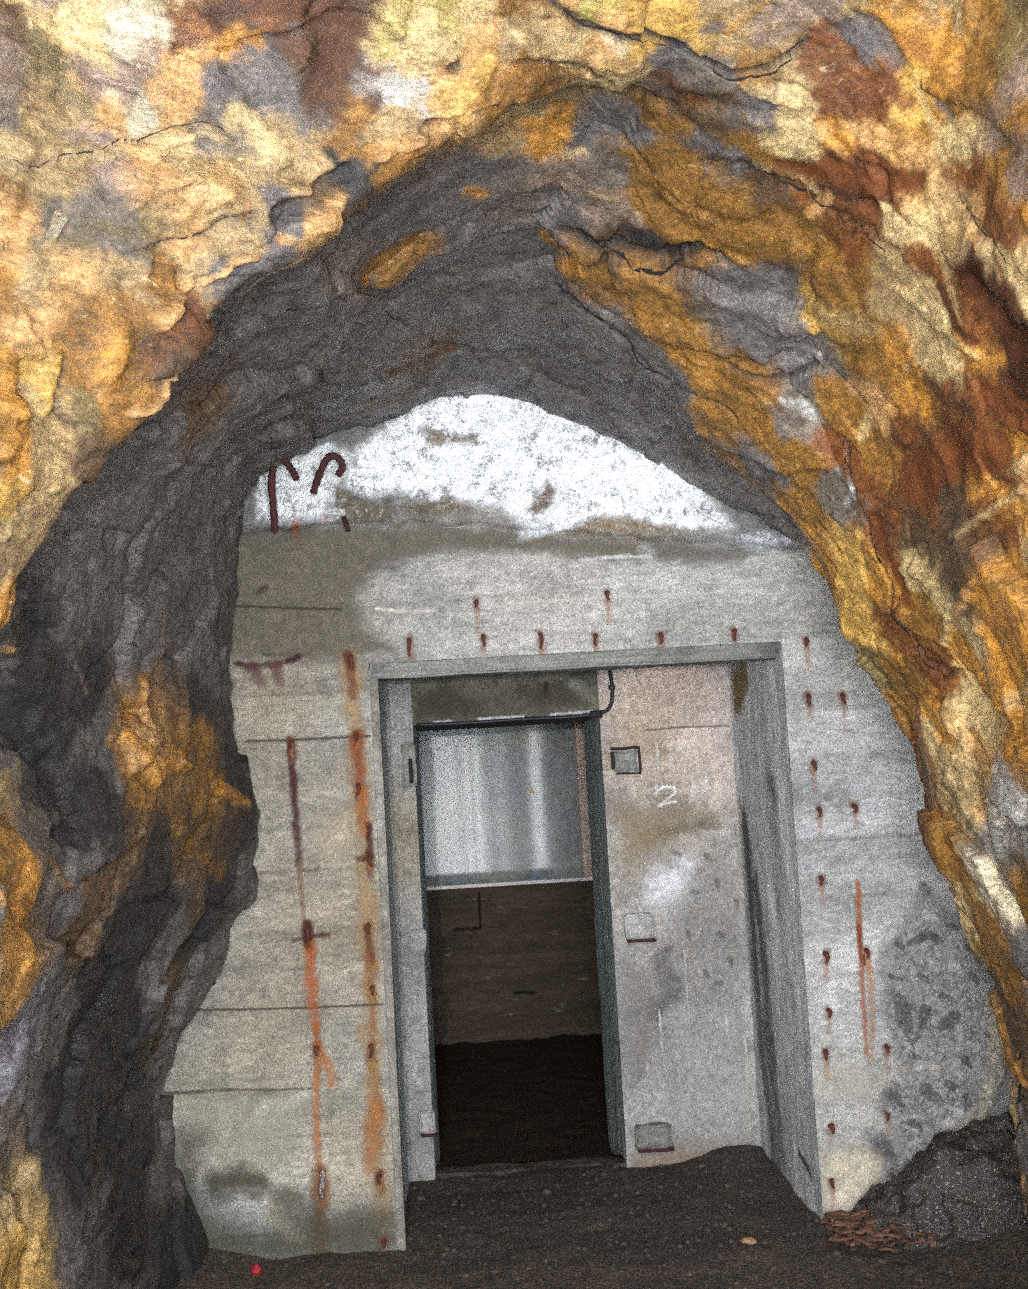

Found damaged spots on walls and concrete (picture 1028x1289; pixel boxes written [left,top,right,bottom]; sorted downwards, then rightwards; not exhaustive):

corrosion [235,654,300,681]
corrosion [287,738,302,894]
corrosion [344,651,377,1021]
corrosion [298,920,330,1006]
corrosion [856,882,872,1052]
leakage [209,1090,310,1150]
corrosion [312,1023,329,1226]
corrosion [367,1043,383,1191]
leakage [175,1151,392,1260]